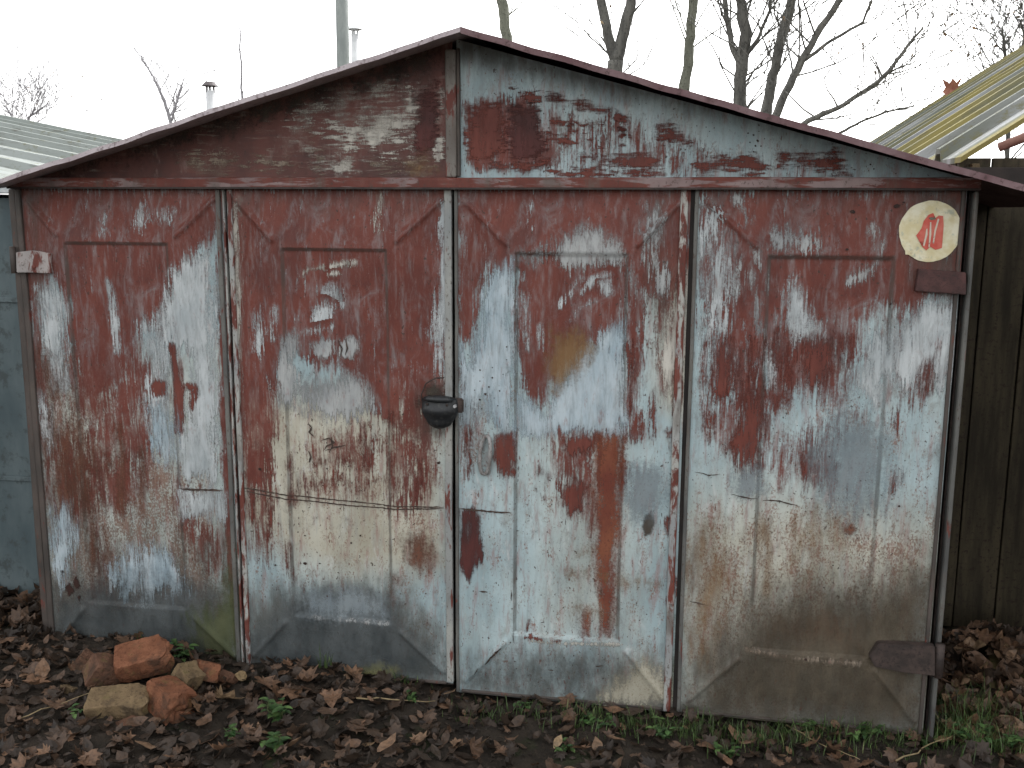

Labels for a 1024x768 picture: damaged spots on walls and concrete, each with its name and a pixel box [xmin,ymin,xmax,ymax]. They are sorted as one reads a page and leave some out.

peeling [284,79,446,175]
peeling [463,87,665,177]
peeling [690,131,853,177]
peeling [34,281,70,454]
peeling [106,279,122,354]
peeling [136,248,227,523]
peeling [233,199,394,491]
peeling [458,190,958,478]
peeling [104,537,192,608]
damp [61,591,208,651]
damp [256,594,420,674]
damp [715,596,922,722]